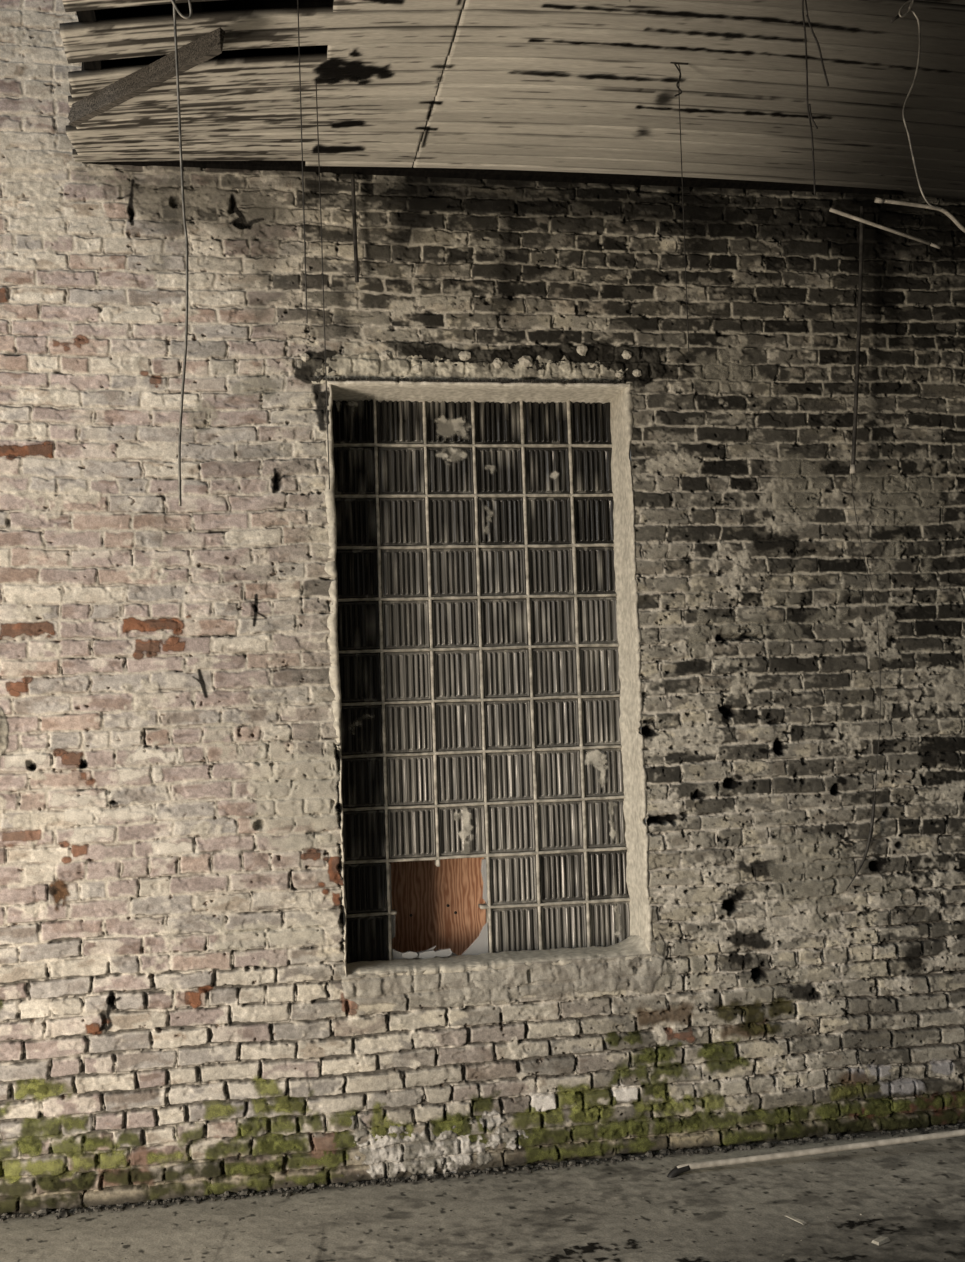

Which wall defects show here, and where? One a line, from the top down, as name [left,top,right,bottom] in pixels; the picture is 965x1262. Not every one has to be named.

damp [835,193,897,314]
spalling [294,350,339,384]
spalling [384,340,666,388]
spalling [718,705,734,724]
spalling [759,741,788,755]
spalling [722,891,744,911]
spalling [750,967,767,981]
damp [531,1092,556,1111]
damp [611,1083,638,1101]
damp [848,1064,923,1113]